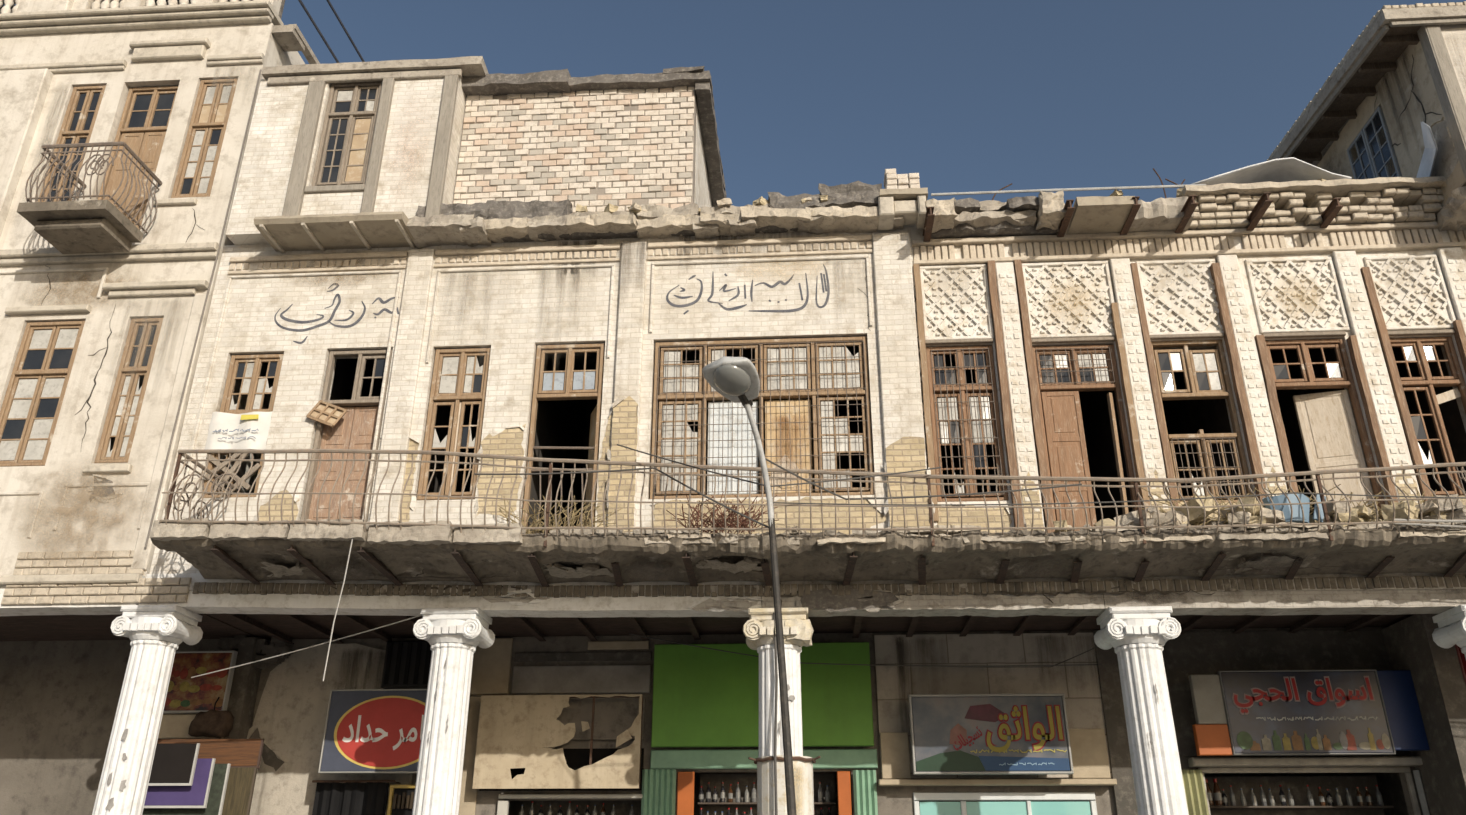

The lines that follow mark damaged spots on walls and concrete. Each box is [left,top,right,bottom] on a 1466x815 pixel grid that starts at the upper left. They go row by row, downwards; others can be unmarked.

crack [75,305,116,447]
spalling [474,424,526,523]
spalling [550,396,1466,575]
spalling [261,562,310,579]
peeling [685,596,763,612]